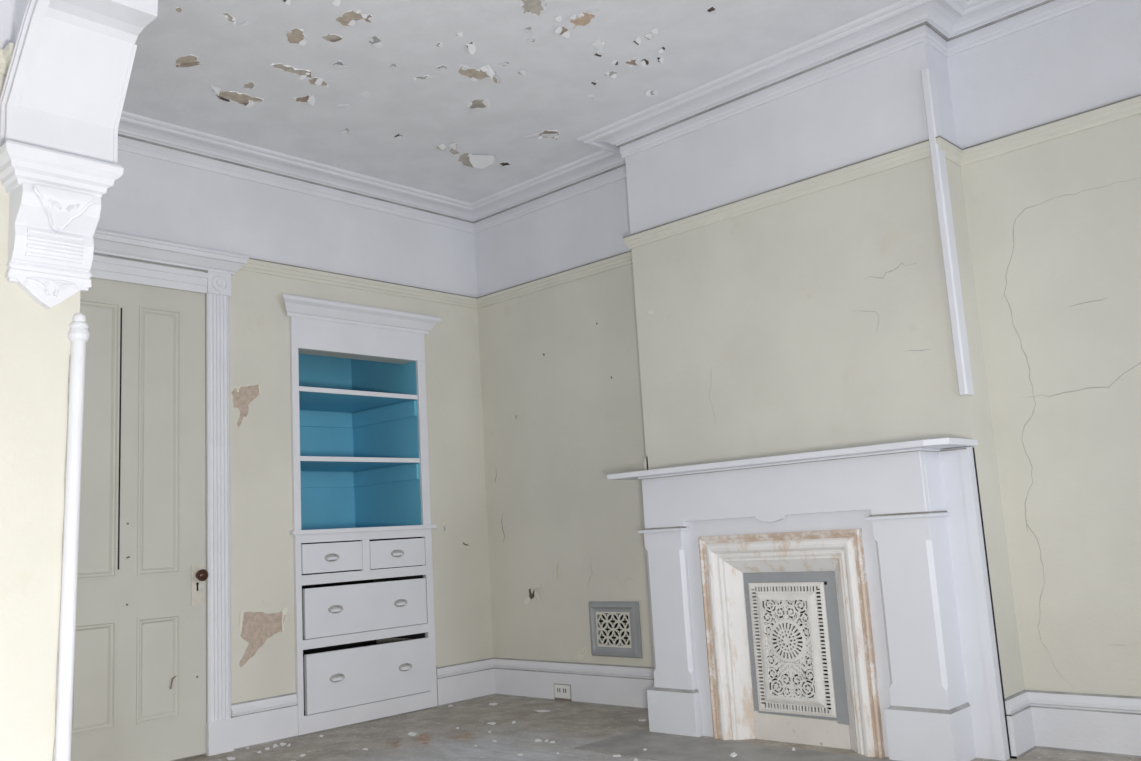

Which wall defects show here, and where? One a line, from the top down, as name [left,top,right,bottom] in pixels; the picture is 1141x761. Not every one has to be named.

peeling [175,54,202,67]
peeling [286,28,307,46]
peeling [321,0,384,49]
peeling [413,32,527,84]
peeling [520,0,598,43]
peeling [591,28,666,85]
peeling [211,81,264,108]
peeling [269,63,329,105]
peeling [436,142,511,169]
flaking render [231,384,261,428]
crack [1003,177,1141,689]
flaking render [239,607,288,667]